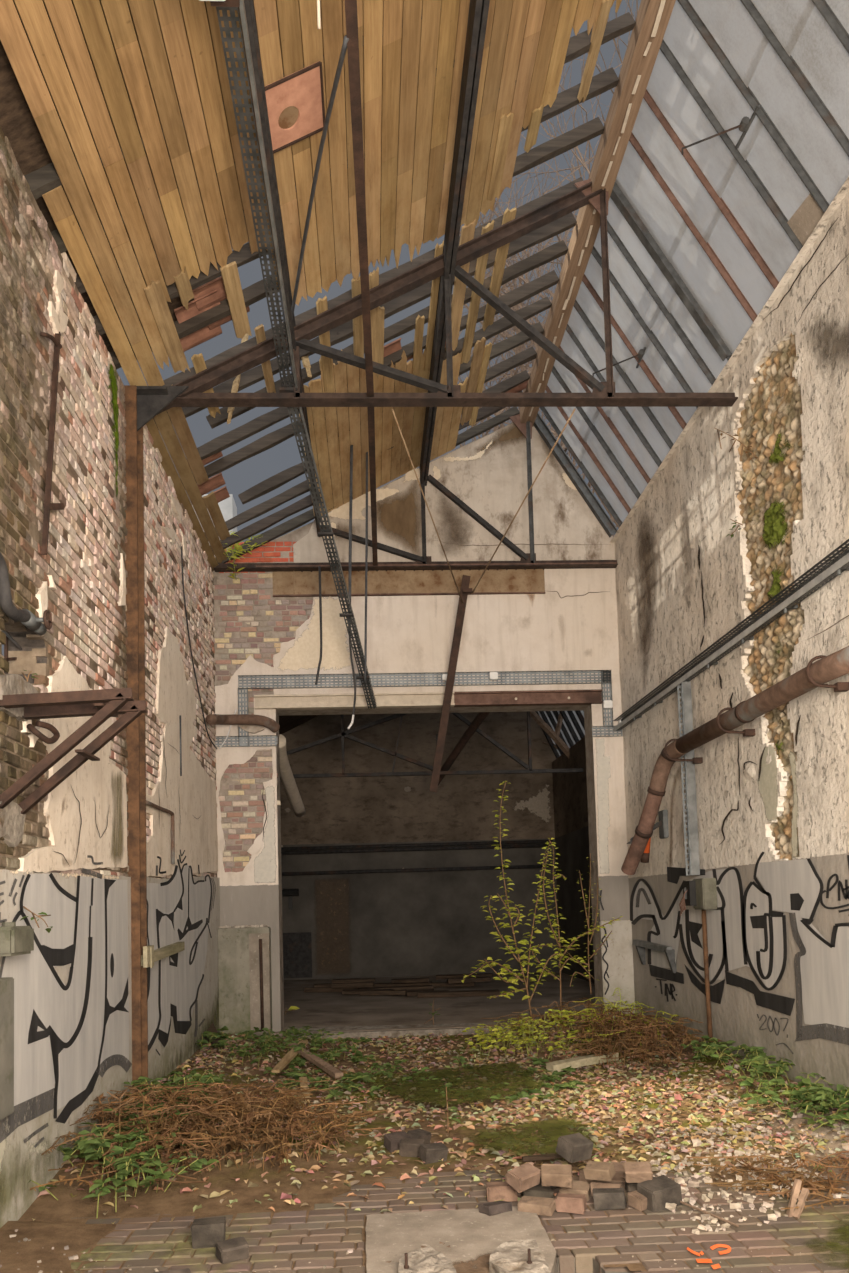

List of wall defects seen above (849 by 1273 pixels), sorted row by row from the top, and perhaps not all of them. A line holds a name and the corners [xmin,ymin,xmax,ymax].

flaking render [737,333,805,694]
peeling [1,575,91,692]
flaking render [214,542,351,682]
peeling [10,716,128,879]
peeling [146,628,281,883]
flaking render [758,702,800,860]